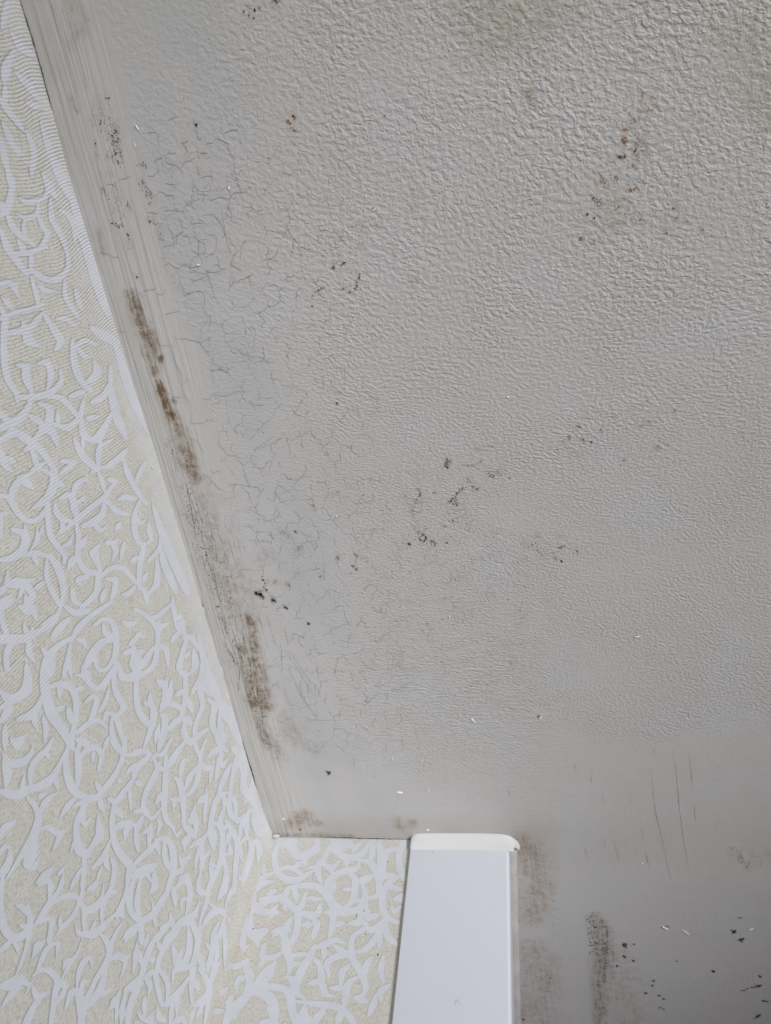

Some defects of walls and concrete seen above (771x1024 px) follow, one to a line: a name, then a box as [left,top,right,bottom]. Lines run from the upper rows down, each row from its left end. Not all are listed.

damp [126,274,288,755]
crack [107,117,357,732]